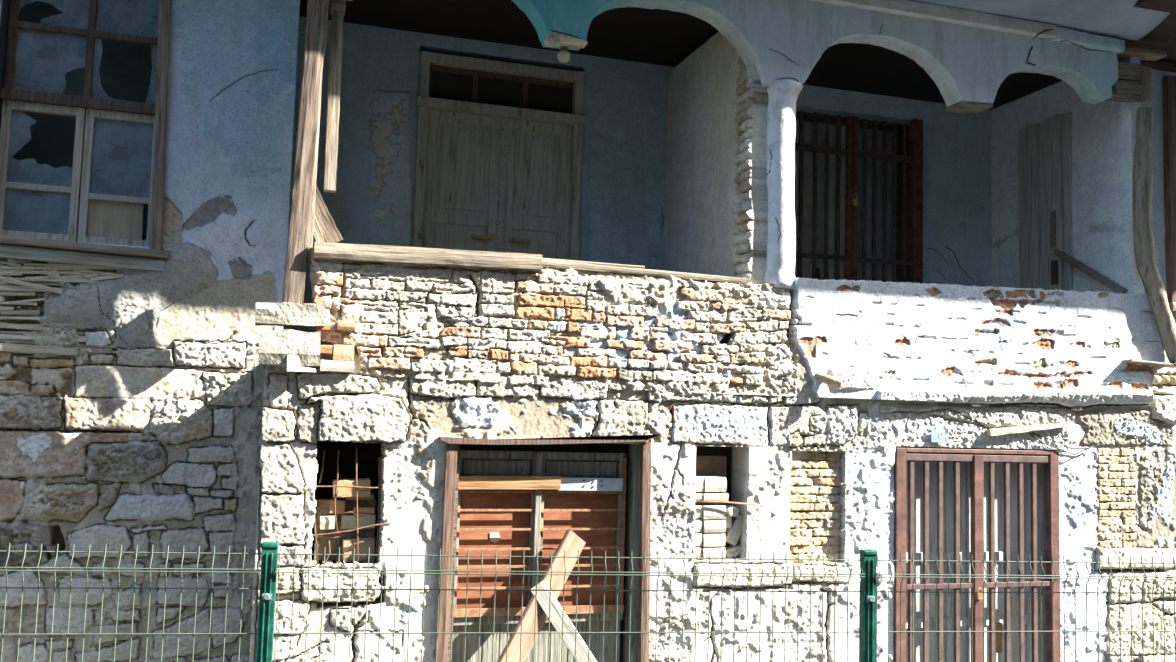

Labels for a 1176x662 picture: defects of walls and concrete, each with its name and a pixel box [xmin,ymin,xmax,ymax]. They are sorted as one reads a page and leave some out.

crack [1026,29,1109,66]
flaking render [163,193,237,236]
flaking render [228,257,252,279]
peeling [798,336,826,358]
peeling [968,289,1153,391]
peeling [941,367,963,389]
peeling [1114,416,1176,547]